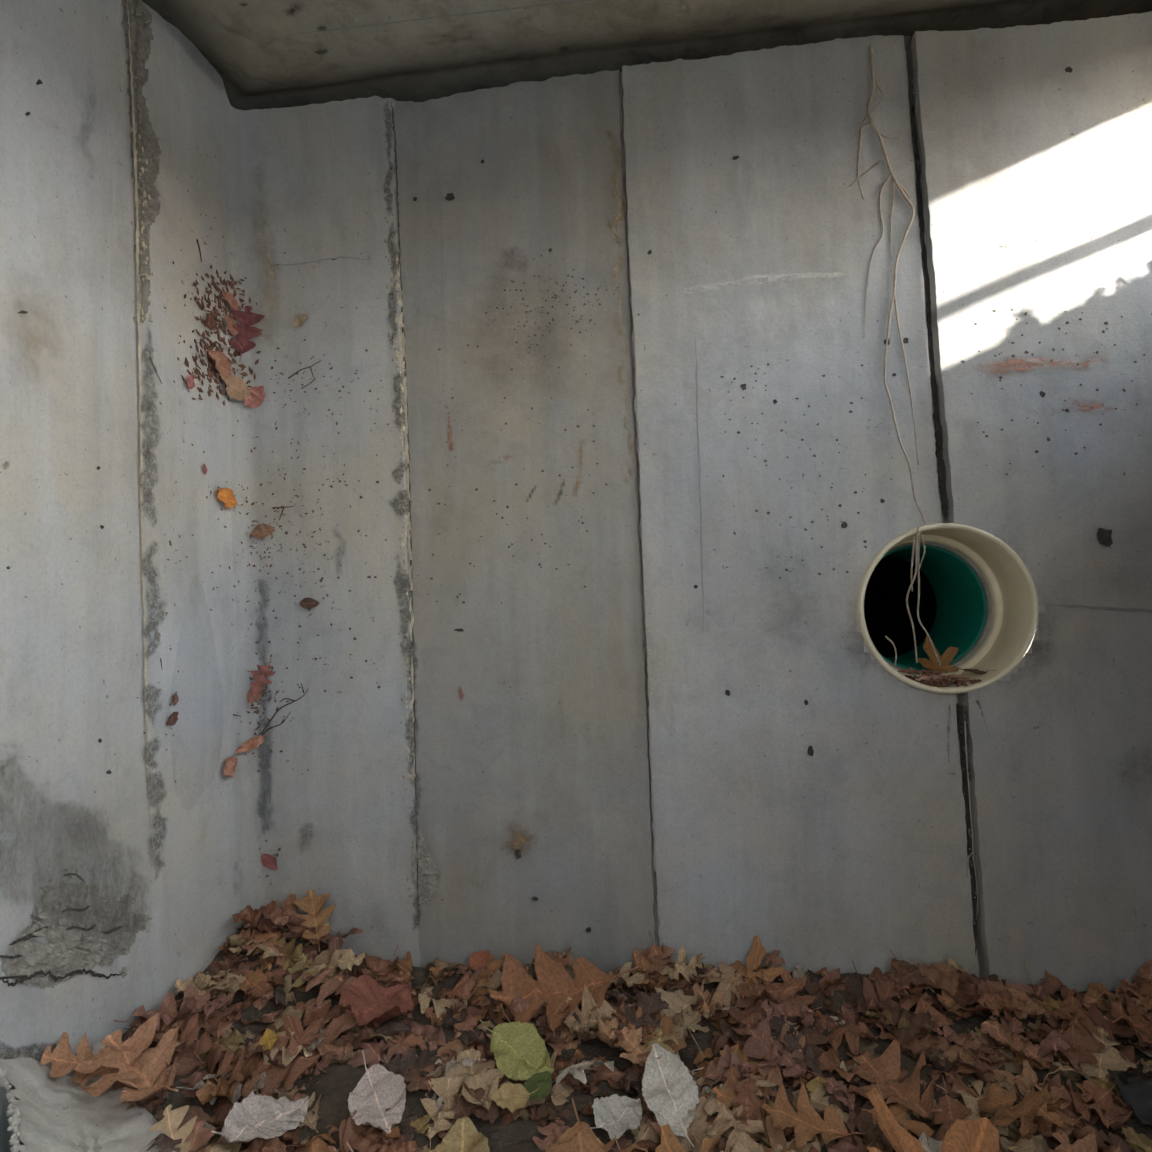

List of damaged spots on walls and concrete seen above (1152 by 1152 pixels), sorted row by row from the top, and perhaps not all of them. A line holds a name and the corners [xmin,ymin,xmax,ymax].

spalling [0,869,152,989]